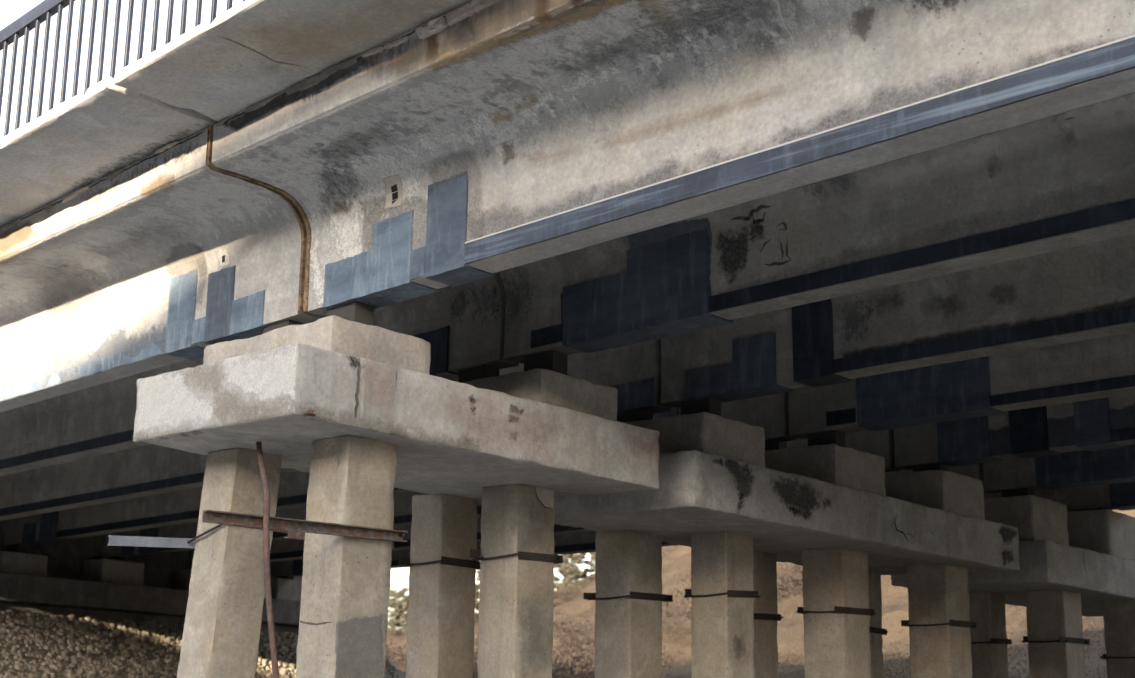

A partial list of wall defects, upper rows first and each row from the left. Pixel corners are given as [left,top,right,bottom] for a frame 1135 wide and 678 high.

rust [376,0,625,75]
water stain [0,0,957,316]
water stain [134,373,213,434]
water stain [225,346,301,401]
crack [350,356,361,418]